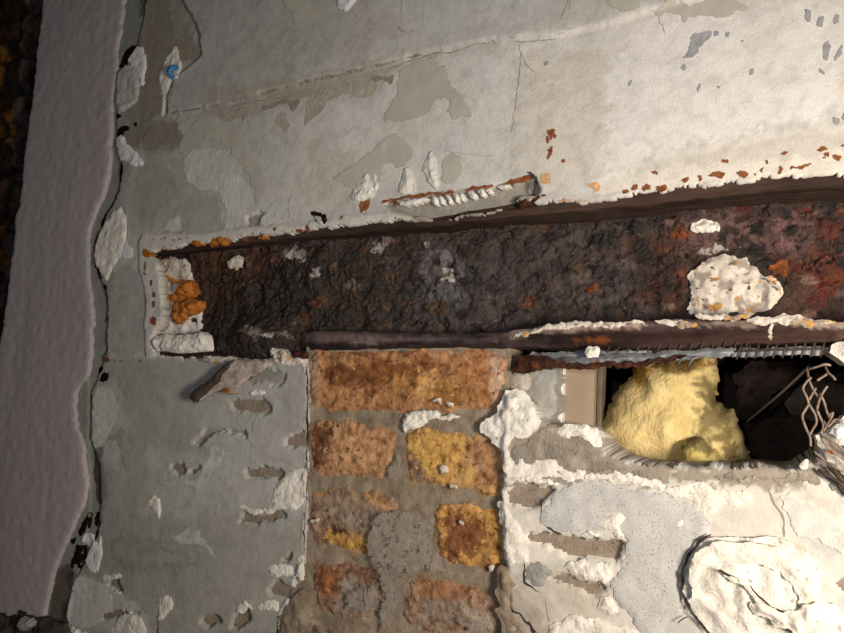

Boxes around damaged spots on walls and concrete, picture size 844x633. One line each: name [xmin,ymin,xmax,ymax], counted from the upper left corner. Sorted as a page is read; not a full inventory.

peeling [651,0,748,23]
crack [168,0,571,127]
corrosion [682,159,729,183]
corrosion [817,144,844,161]
corrosion [381,190,454,206]
corrosion [164,271,206,325]
corrosion [571,354,687,370]
spalling [596,366,633,416]
spalling [715,355,844,461]
peeling [81,533,103,573]
crack [678,534,711,633]
crack [718,570,792,632]